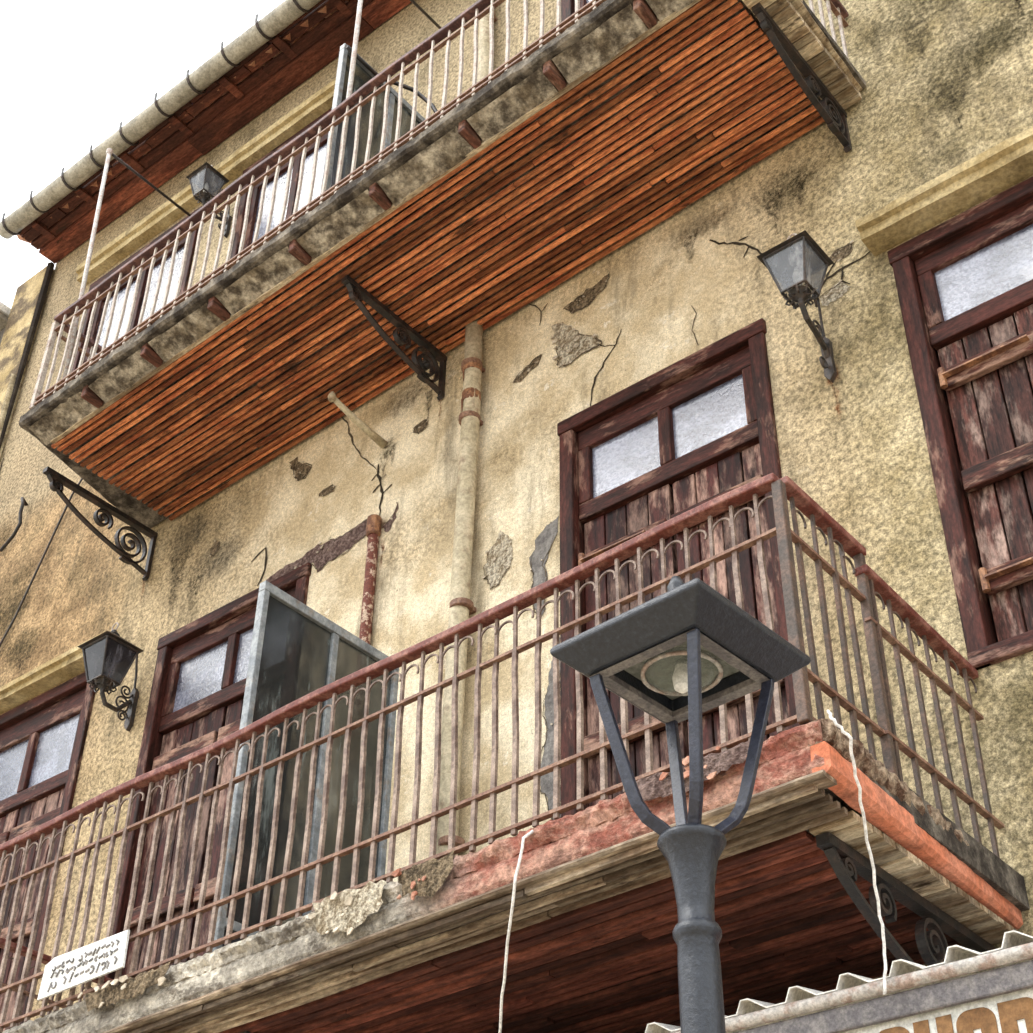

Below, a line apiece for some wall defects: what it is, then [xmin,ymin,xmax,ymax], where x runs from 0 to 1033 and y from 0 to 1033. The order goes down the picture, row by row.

crack [709,236,762,257]
spalling [513,272,610,383]
crack [590,330,621,406]
spalling [289,456,312,481]
crack [342,417,392,516]
peeling [382,502,399,532]
peeling [265,519,367,582]
spalling [482,531,513,590]
peeling [529,516,559,589]
spalling [636,756,690,801]
spalling [703,740,750,781]
spalling [309,850,454,936]